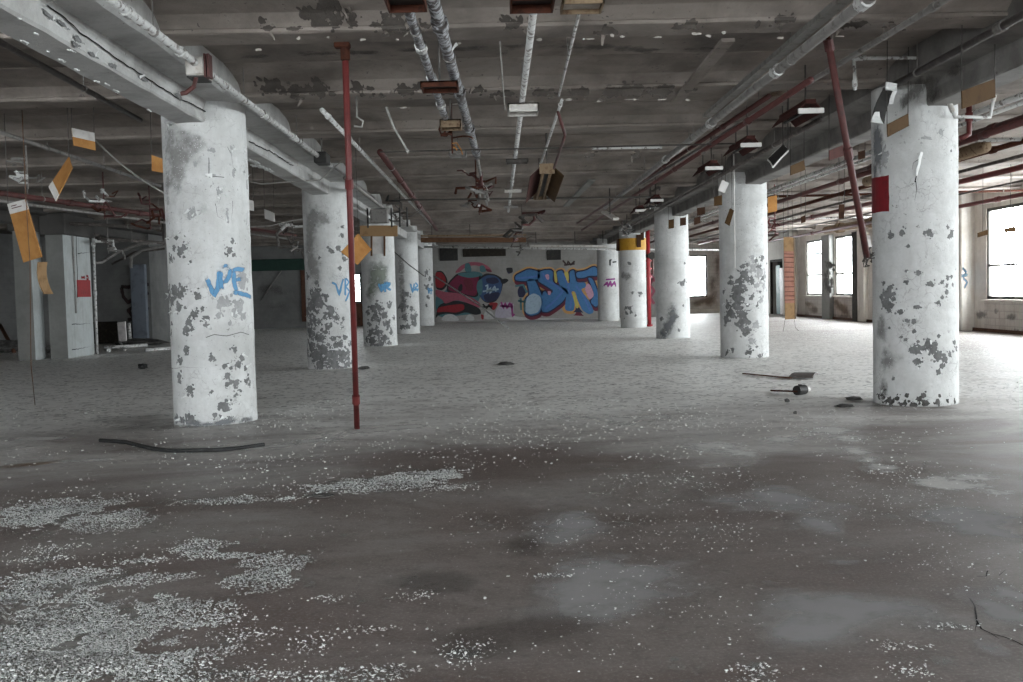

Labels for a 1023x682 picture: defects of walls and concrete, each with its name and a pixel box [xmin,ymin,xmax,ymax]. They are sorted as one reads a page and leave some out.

peeling [258,0,431,41]
peeling [253,76,336,107]
peeling [165,235,192,265]
peeling [165,267,249,398]
peeling [306,272,352,370]
peeling [365,267,433,346]
peeling [722,254,768,358]
peeling [879,270,958,375]
peeling [209,345,251,421]
spalling [876,377,956,407]
water stain [552,562,668,618]
crack [970,599,1023,646]